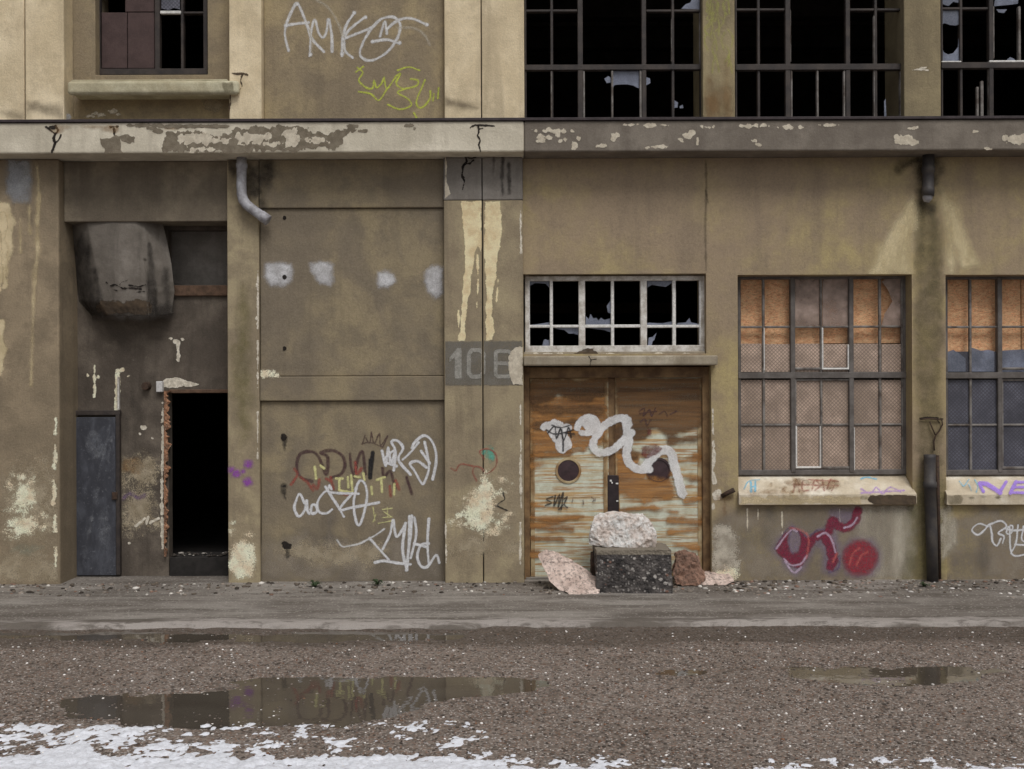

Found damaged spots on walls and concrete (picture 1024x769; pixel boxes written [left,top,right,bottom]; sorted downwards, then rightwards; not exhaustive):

peeling [87,99,368,153]
crack [461,124,495,190]
peeling [596,123,669,148]
peeling [739,123,804,147]
peeling [894,126,919,146]
damp [871,158,979,455]
spalling [114,368,129,410]
spalling [0,417,58,567]
spalling [121,377,199,557]
spalling [445,439,523,565]
corrosion [530,378,702,558]
spalling [228,521,257,580]